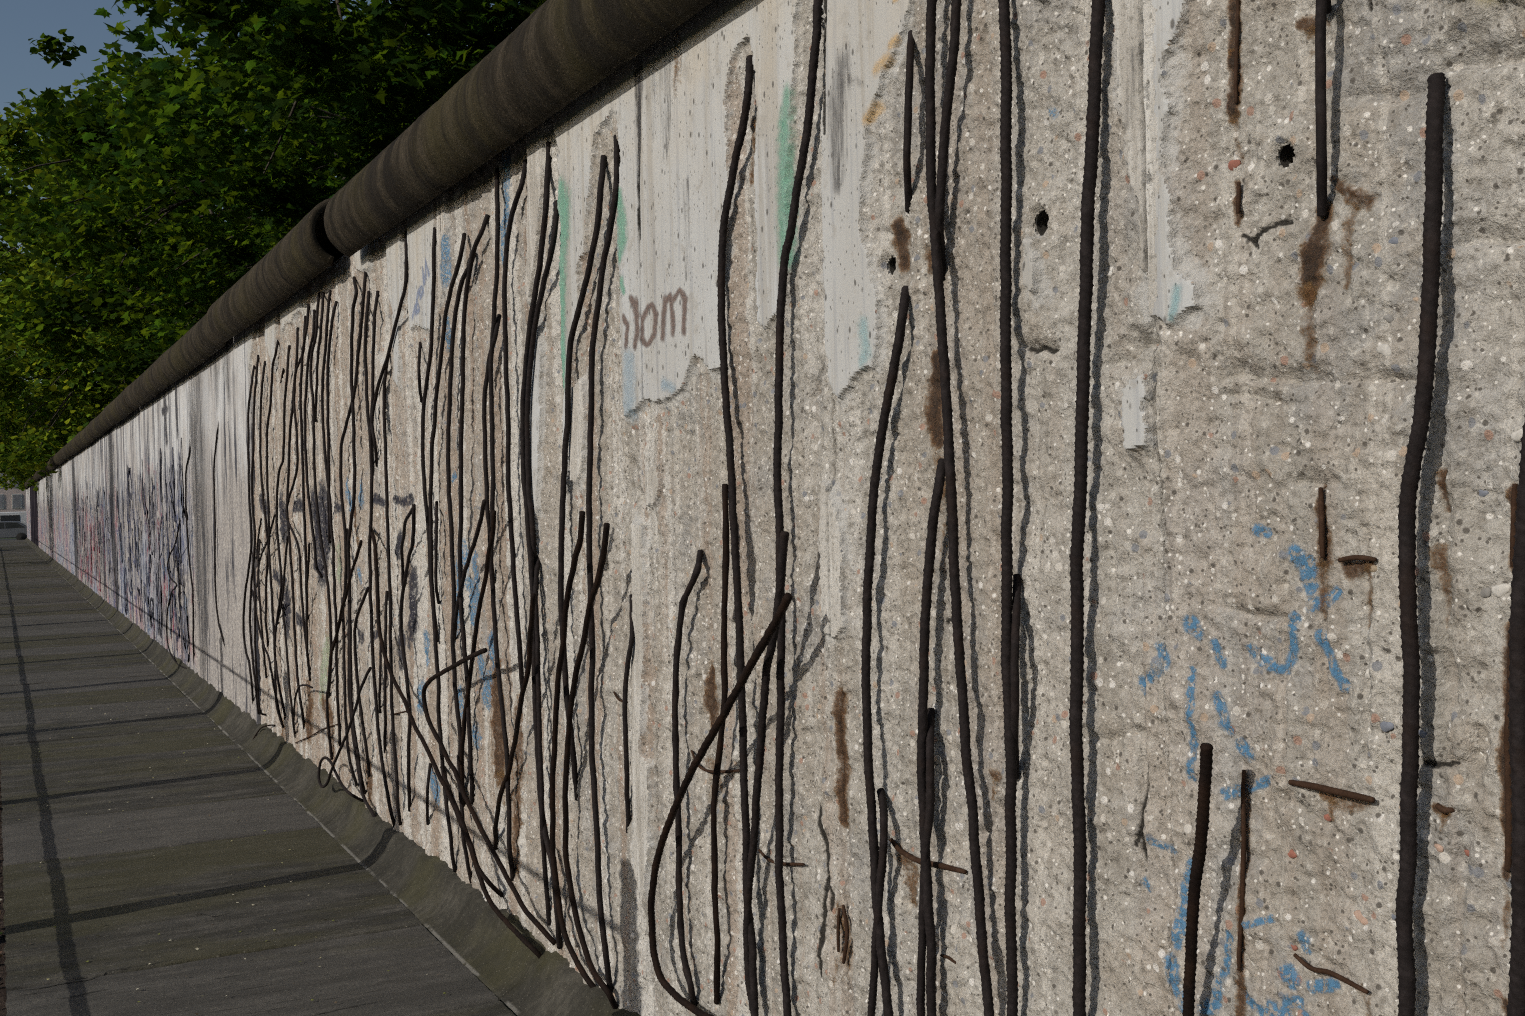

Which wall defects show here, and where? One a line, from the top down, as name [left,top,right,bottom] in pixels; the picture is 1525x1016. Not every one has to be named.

corrosion [1226,0,1243,125]
corrosion [1297,175,1374,366]
spalling [213,420,225,647]
spalling [242,257,346,767]
spalling [317,0,1525,1016]
corrosion [1315,485,1375,627]
corrosion [832,688,851,828]
corrosion [1495,621,1511,935]